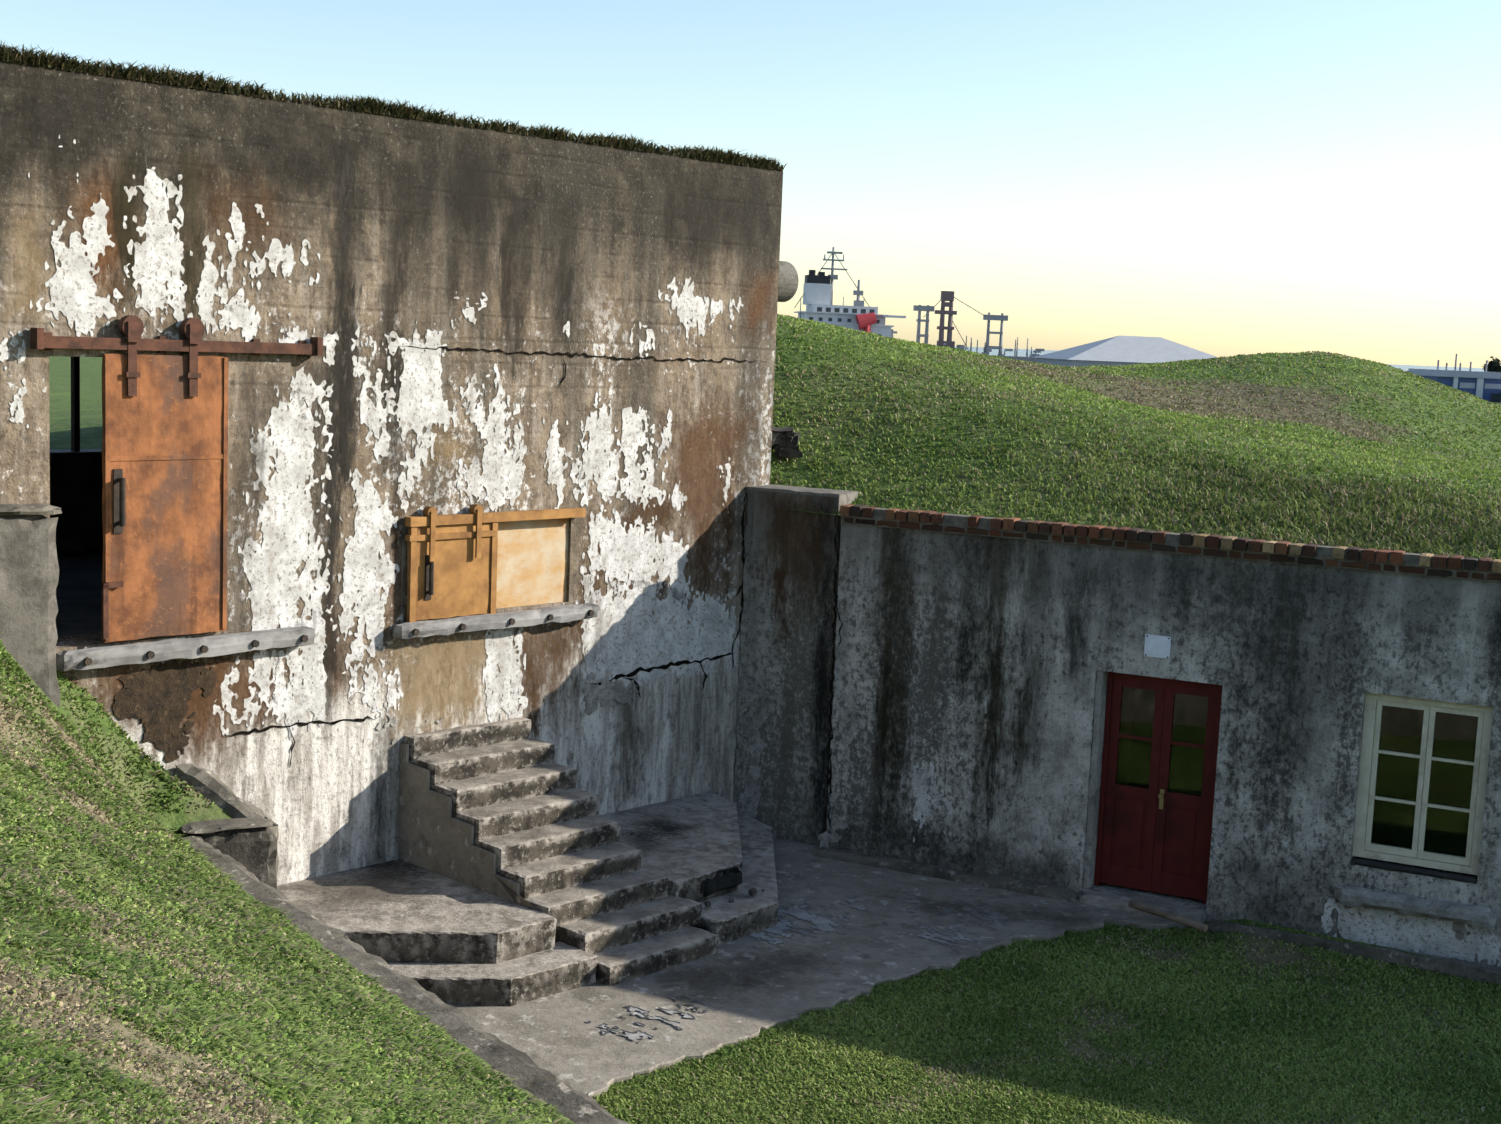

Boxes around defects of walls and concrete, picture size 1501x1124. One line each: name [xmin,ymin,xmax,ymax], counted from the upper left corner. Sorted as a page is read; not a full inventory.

water stain [383,170,411,378]
peeling [629,316,660,362]
peeling [658,277,743,339]
peeling [29,167,528,762]
crack [220,716,375,767]
peeling [542,392,740,715]
crack [594,484,747,699]
water stain [986,536,1011,759]